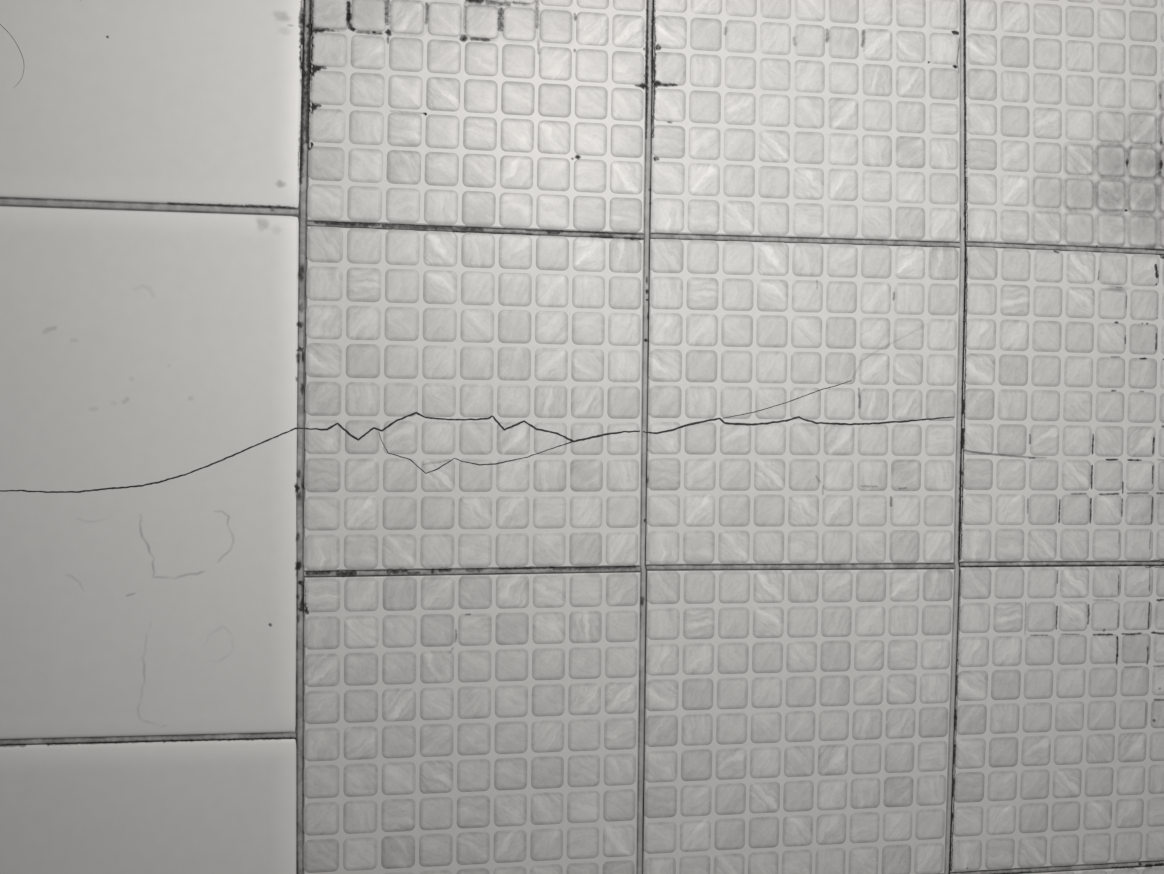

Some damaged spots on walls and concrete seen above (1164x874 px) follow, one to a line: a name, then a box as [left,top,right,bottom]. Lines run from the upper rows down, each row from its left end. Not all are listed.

crack [0,380,954,493]